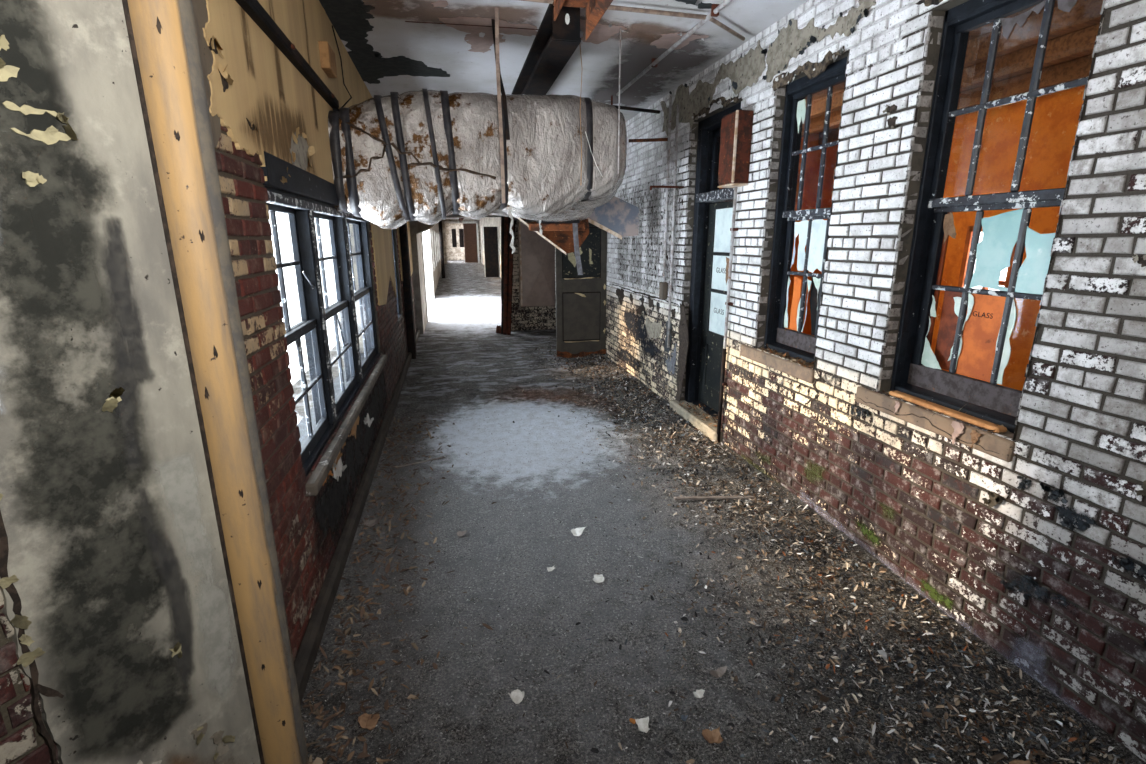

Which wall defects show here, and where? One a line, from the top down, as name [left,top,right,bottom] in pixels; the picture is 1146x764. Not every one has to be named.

peeling [0,35,9,68]
peeling [431,0,537,53]
peeling [650,32,709,50]
spalling [660,0,876,136]
spalling [882,104,898,130]
peeling [22,171,47,184]
leakage [0,0,233,758]
peeling [850,405,871,419]
peeling [951,421,982,449]
peeling [1017,476,1098,532]
peeling [1111,555,1146,579]
peeling [995,571,1077,614]